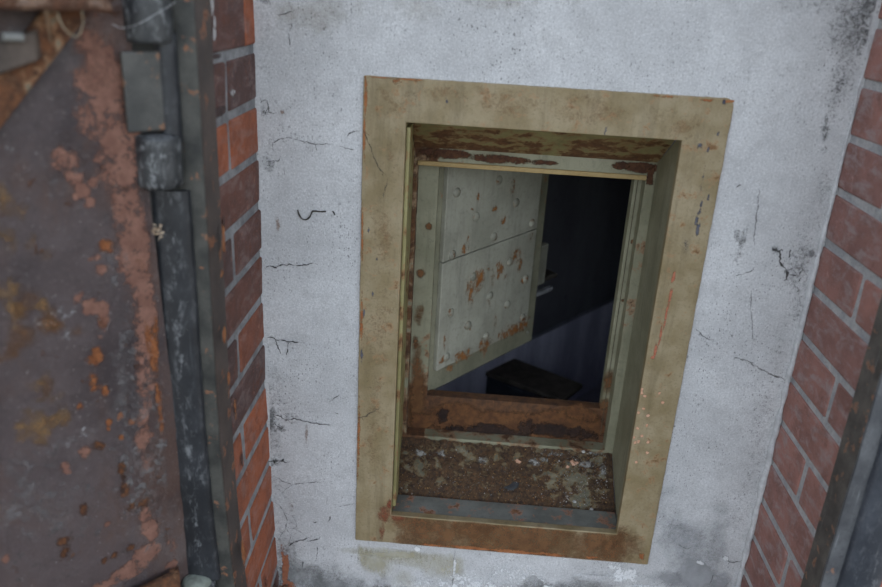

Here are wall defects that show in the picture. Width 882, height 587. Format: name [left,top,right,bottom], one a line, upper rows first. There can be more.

leakage [832,0,876,55]
rust [420,148,559,166]
rust [611,161,657,185]
crack [772,248,802,281]
rust [409,338,426,428]
crack [275,395,339,428]
rust [436,408,598,441]
crack [269,459,350,567]